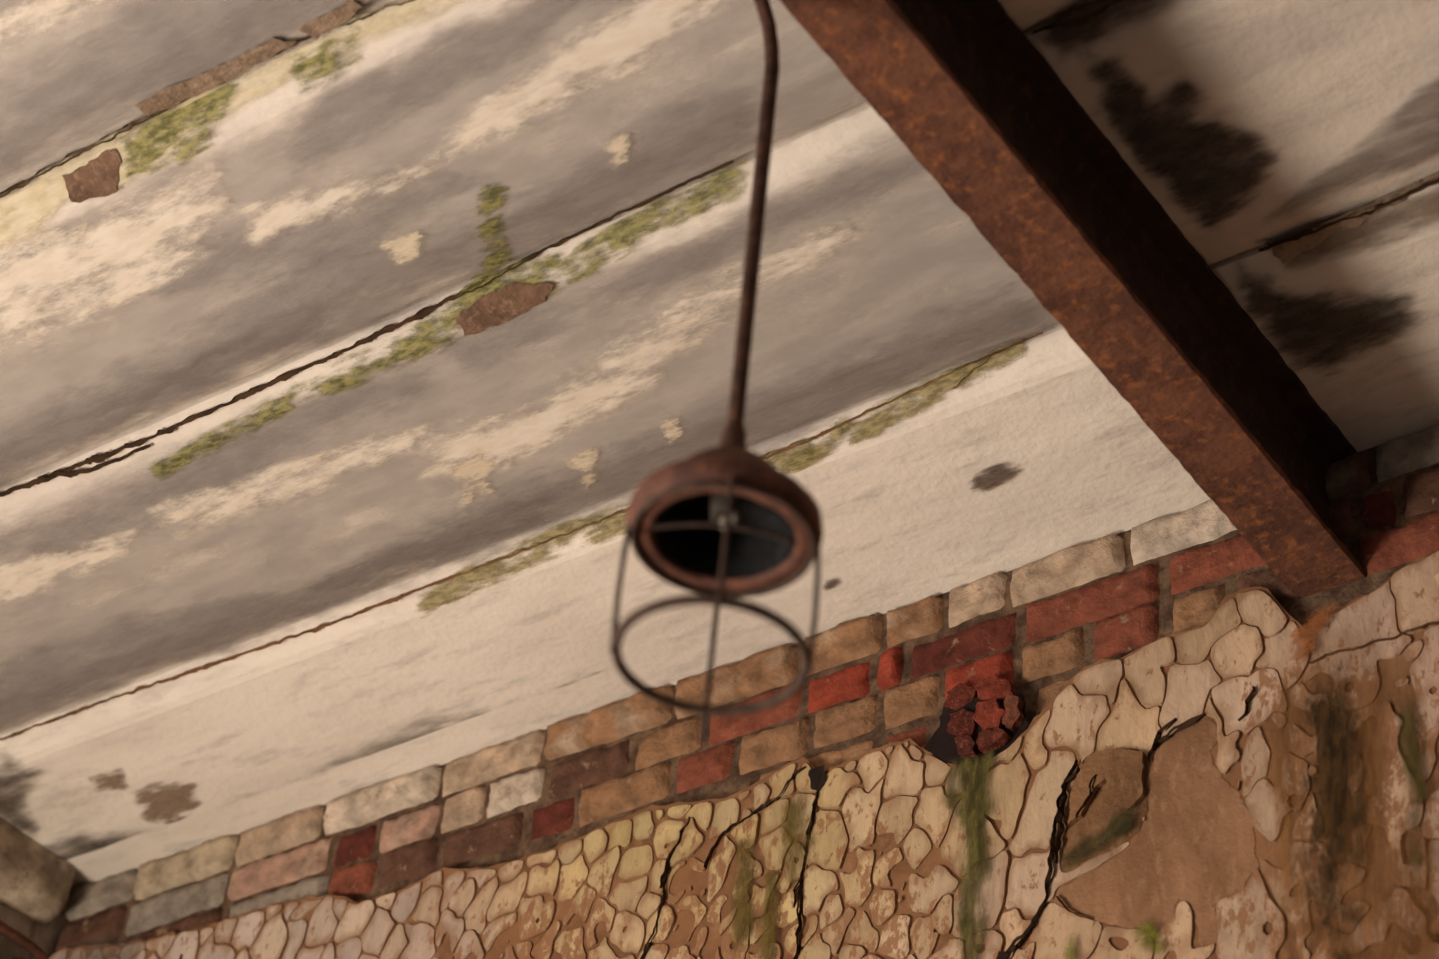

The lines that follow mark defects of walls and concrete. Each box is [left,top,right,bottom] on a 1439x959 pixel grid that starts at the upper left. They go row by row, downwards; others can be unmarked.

spalling [62,149,122,203]
leakage [1092,61,1274,227]
spalling [455,282,553,337]
leakage [0,0,1055,726]
leakage [1242,275,1410,367]
flaking render [1325,425,1439,576]
leakage [0,764,37,832]
flaking render [55,499,1297,953]
crack [640,766,822,959]
crack [996,759,1078,959]
crack [1238,686,1256,721]
crack [1309,621,1439,664]